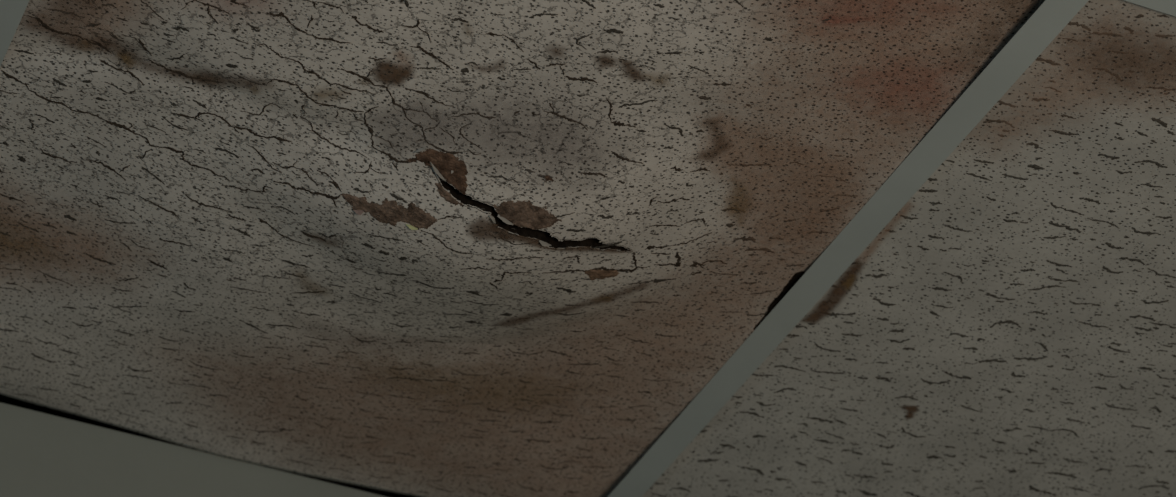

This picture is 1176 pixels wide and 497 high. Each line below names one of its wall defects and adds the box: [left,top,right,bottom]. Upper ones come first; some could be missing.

spalling [341,193,438,230]
crack [0,0,875,497]
spalling [492,200,562,230]
crack [649,14,1176,497]